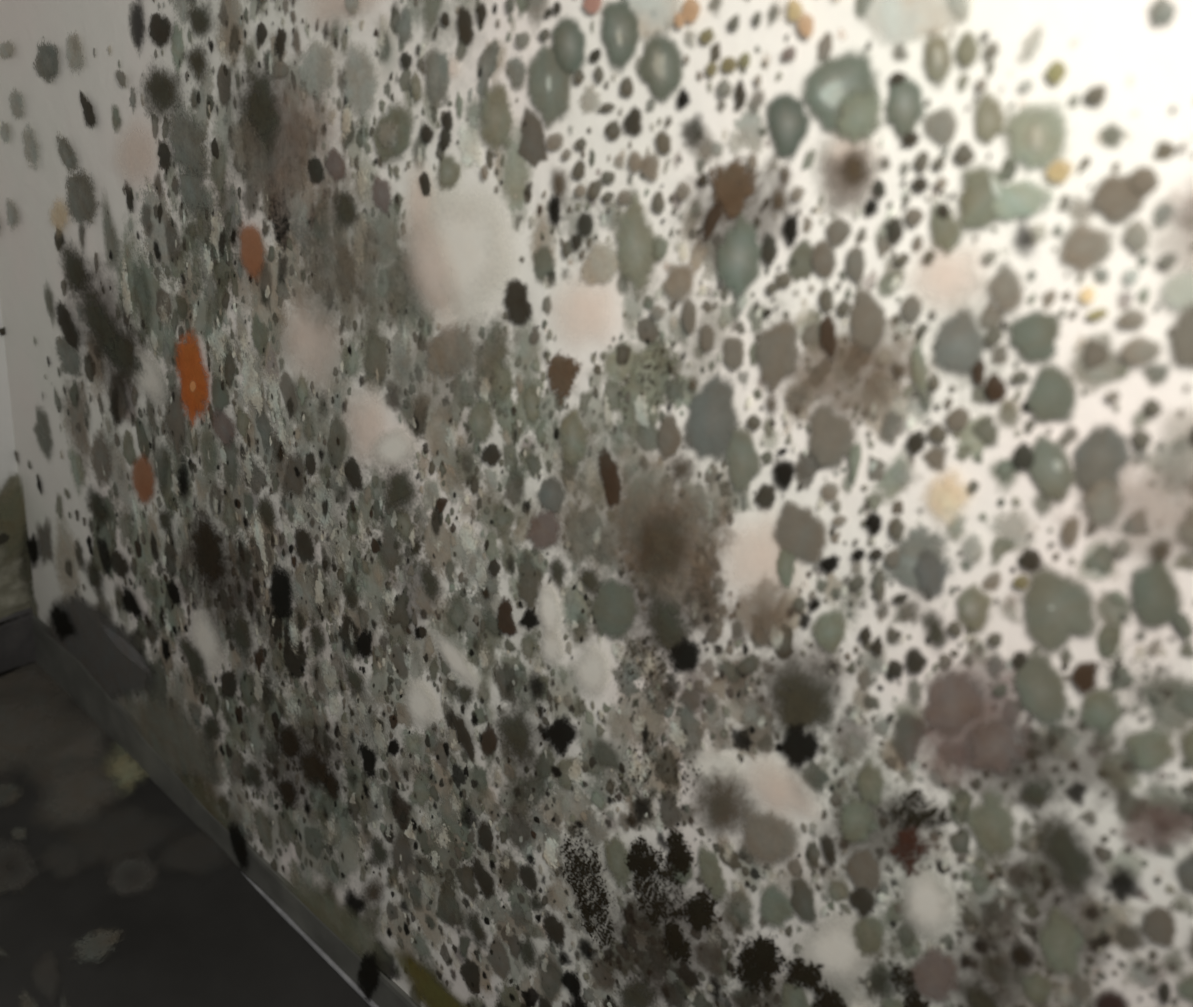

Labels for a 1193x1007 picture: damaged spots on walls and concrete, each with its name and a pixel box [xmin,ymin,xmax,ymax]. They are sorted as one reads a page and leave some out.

water stain [80,92,96,128]
water stain [1069,84,1106,107]
mould [1102,124,1123,146]
mould [1154,141,1193,159]
mould [529,170,567,281]
water stain [835,132,975,302]
water stain [1027,268,1108,320]
mould [1075,337,1129,412]
flaking render [0,474,20,500]
water stain [979,461,1193,590]
flaking render [0,530,31,619]
water stain [1061,591,1193,729]